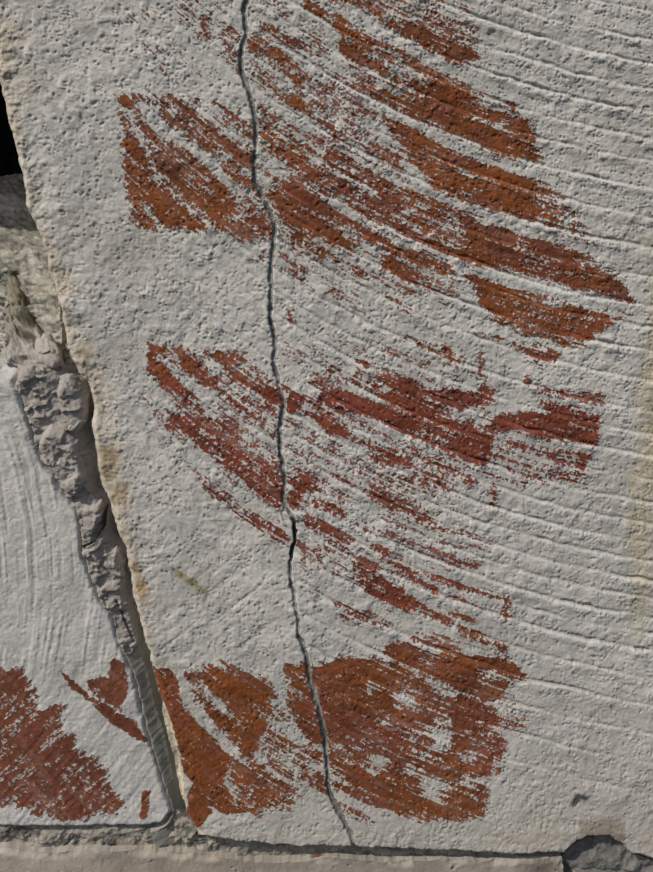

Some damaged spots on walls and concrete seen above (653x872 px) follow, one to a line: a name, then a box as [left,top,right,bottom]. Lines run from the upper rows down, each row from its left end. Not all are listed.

crack [238,0,356,845]
spalling [561,835,653,871]